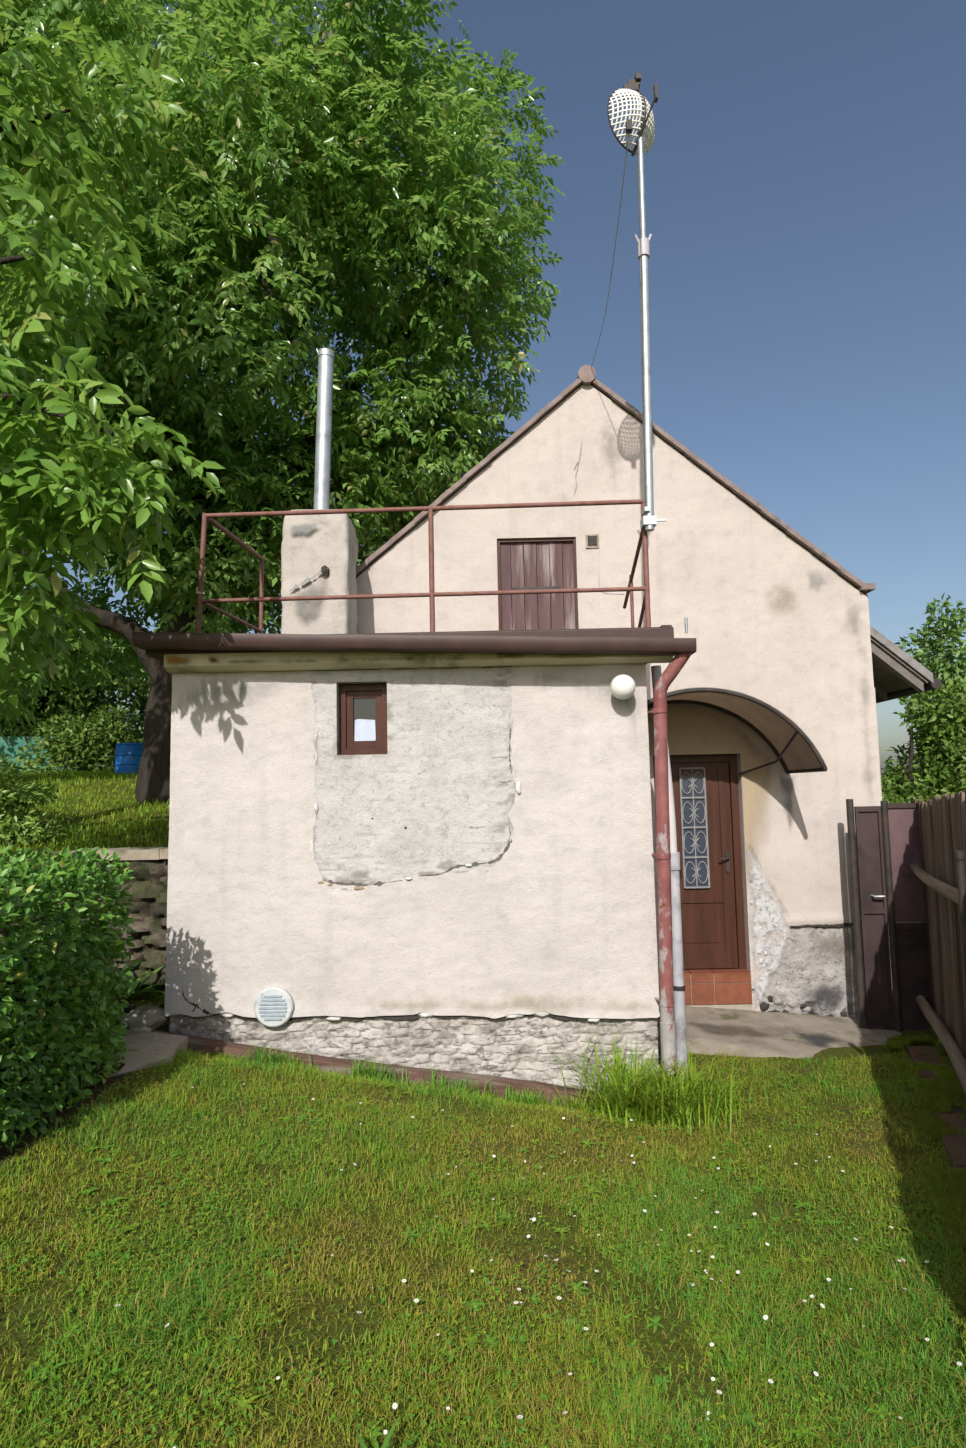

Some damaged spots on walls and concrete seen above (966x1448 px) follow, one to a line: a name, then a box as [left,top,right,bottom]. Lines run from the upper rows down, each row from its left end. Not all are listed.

flaking render [309,667,521,891]
spalling [748,852,867,1018]